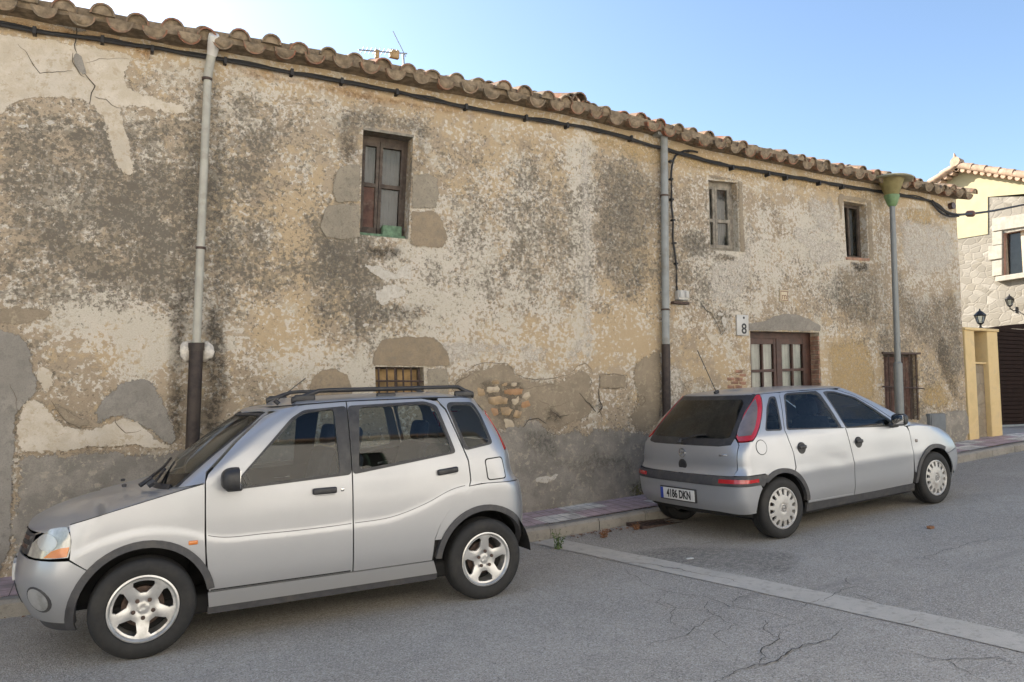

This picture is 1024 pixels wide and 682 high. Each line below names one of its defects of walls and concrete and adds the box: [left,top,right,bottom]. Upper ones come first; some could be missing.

crack [20,28,127,108]
damp [557,140,874,362]
peeling [16,366,170,454]
damp [205,319,227,431]
peeling [452,349,662,432]
crack [580,389,603,416]